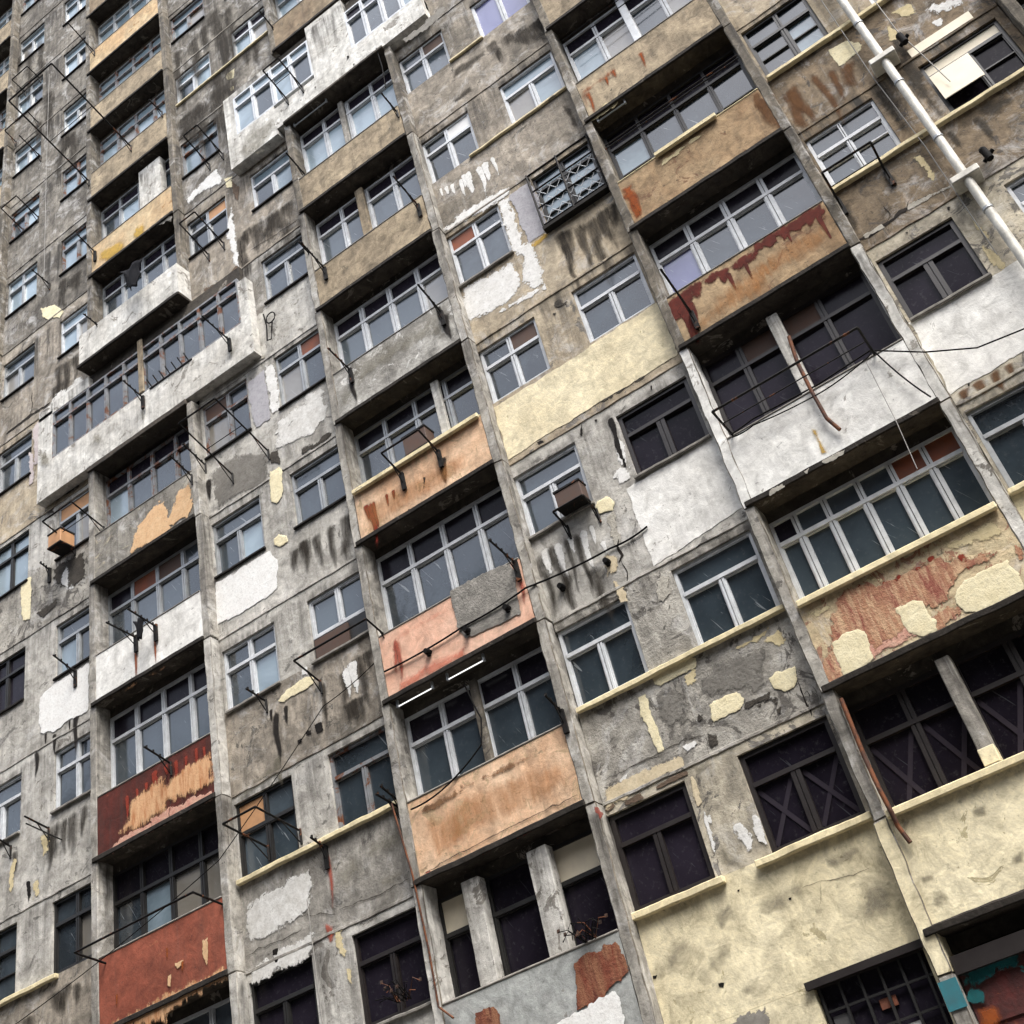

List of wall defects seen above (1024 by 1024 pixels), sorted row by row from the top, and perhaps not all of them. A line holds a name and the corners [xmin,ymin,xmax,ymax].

rust [784,87,814,126]
rust [812,63,854,115]
peeling [440,157,547,321]
damp [531,203,618,284]
damp [292,515,351,567]
rust [364,490,395,543]
peeling [215,551,278,624]
peeling [804,515,1001,682]
peeling [112,751,215,854]
peeling [244,869,314,942]
peeling [251,932,315,984]
peeling [557,942,630,1024]